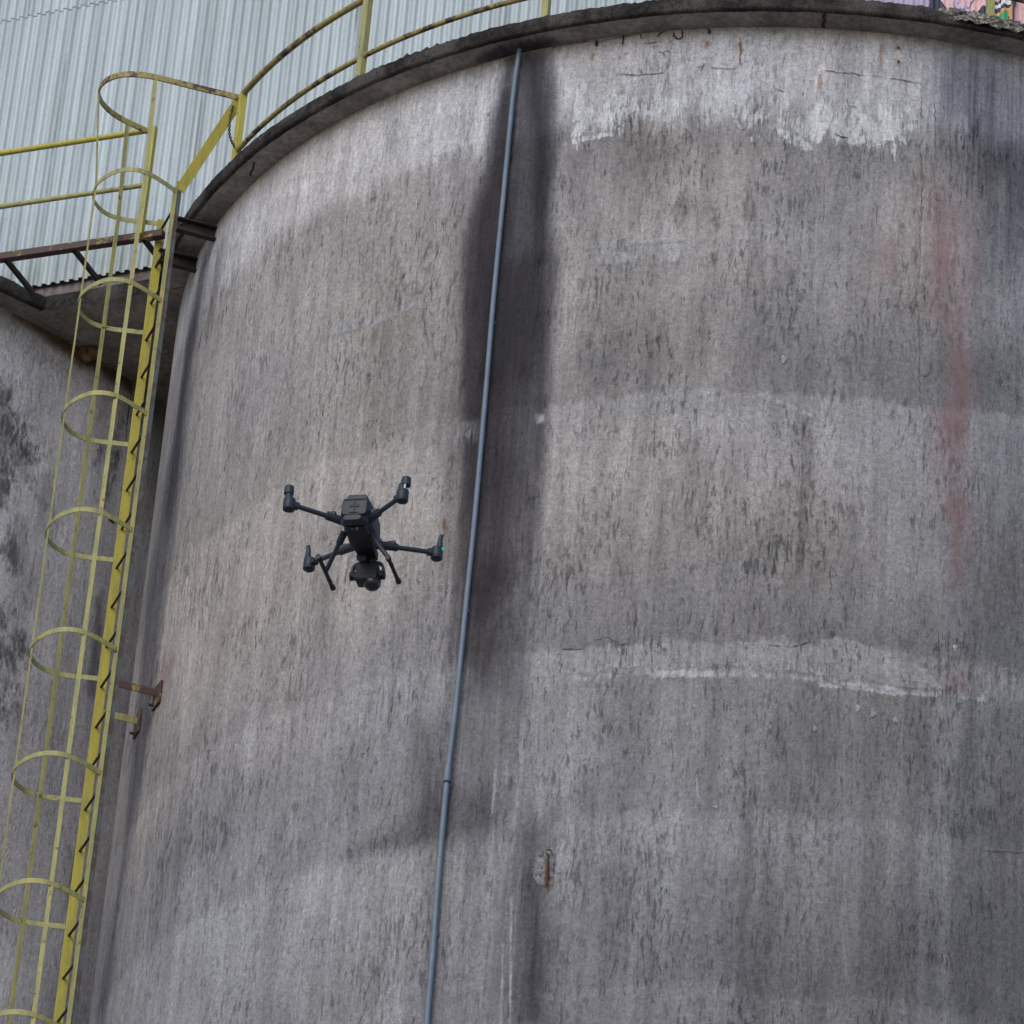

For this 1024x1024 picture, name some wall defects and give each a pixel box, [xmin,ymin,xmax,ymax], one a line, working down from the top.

leakage [571,79,926,161]
leakage [638,668,739,678]
leakage [752,674,937,697]